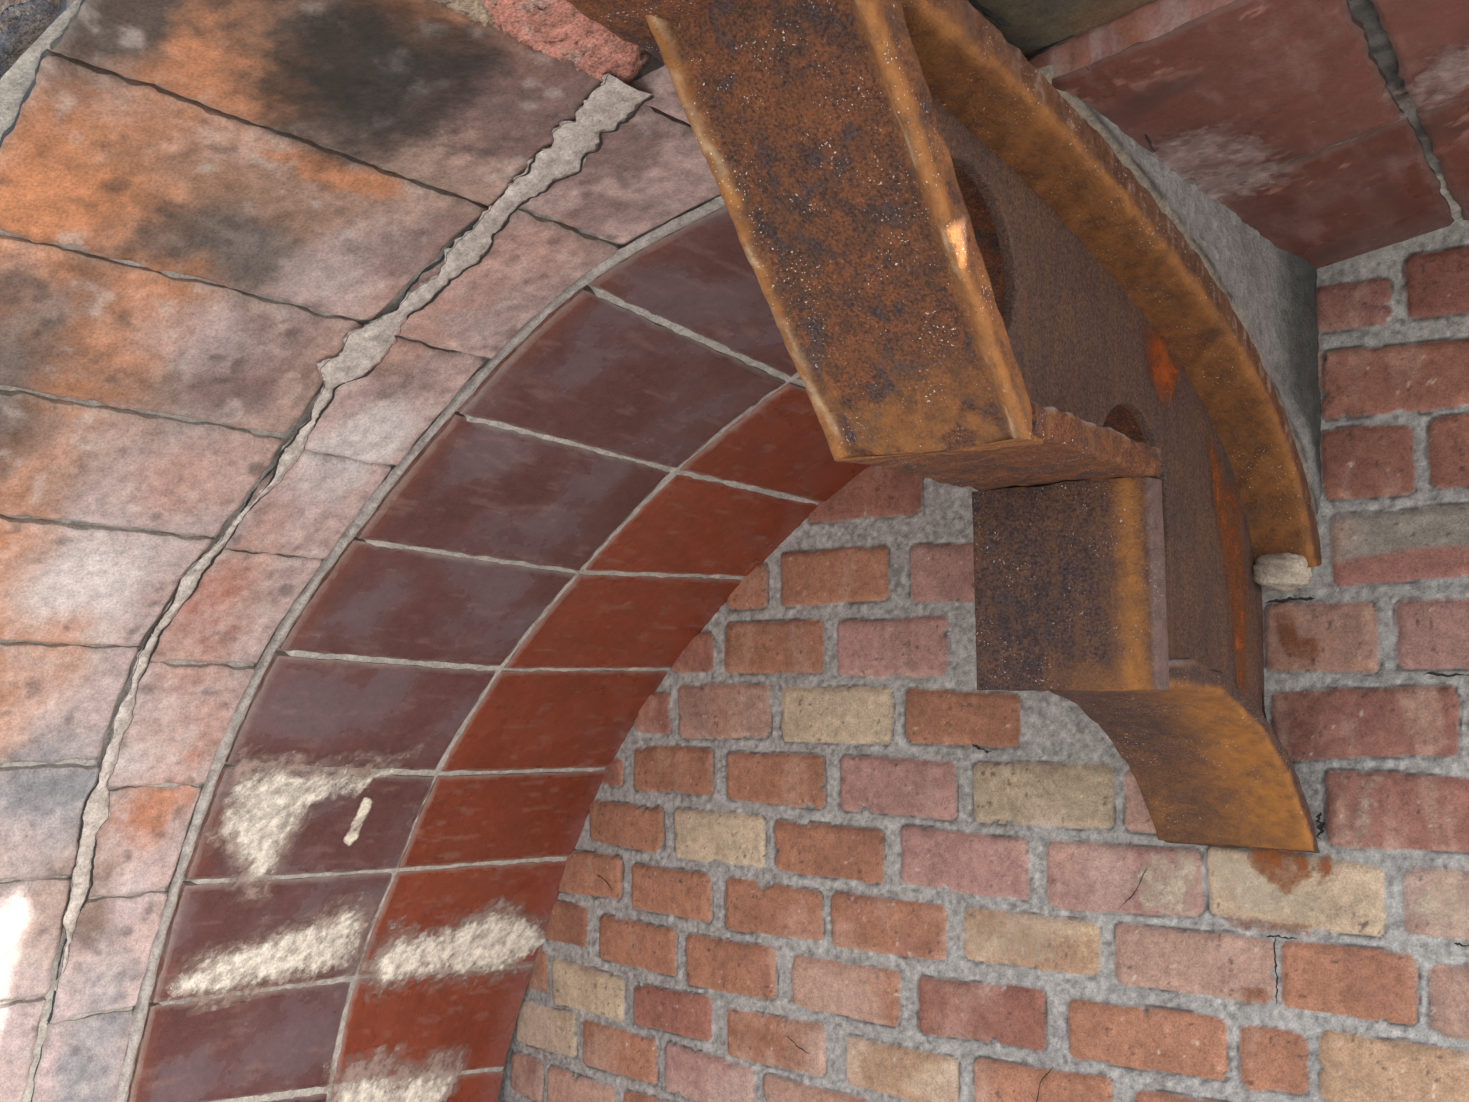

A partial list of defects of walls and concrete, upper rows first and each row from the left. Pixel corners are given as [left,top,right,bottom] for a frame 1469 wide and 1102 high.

spalling [0,0,60,79]
spalling [431,0,651,86]
rust [1148,336,1178,395]
crack [54,73,654,991]
rust [1209,445,1247,686]
leakage [205,745,422,899]
leakage [166,892,547,1011]
leakage [324,1044,465,1102]